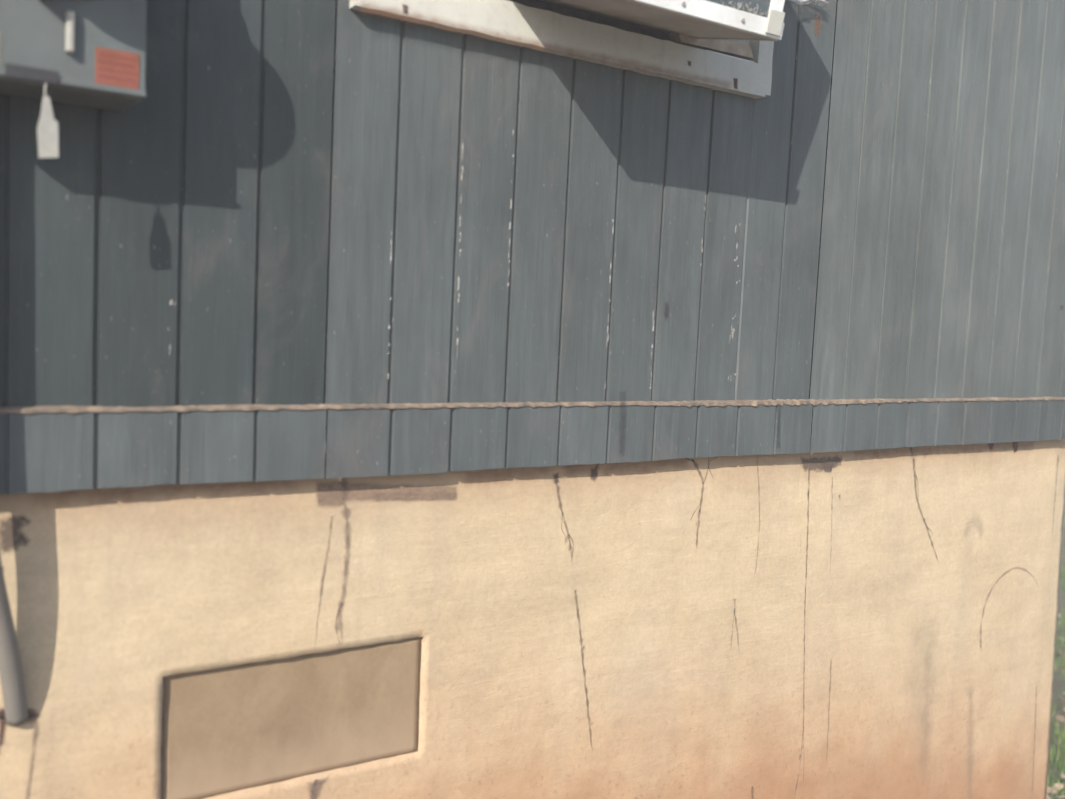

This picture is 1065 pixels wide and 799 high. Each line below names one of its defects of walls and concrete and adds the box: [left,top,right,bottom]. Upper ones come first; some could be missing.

spalling [802,457,842,472]
leakage [319,483,456,505]
spalling [0,517,30,551]
crack [342,478,350,574]
crack [311,780,323,799]